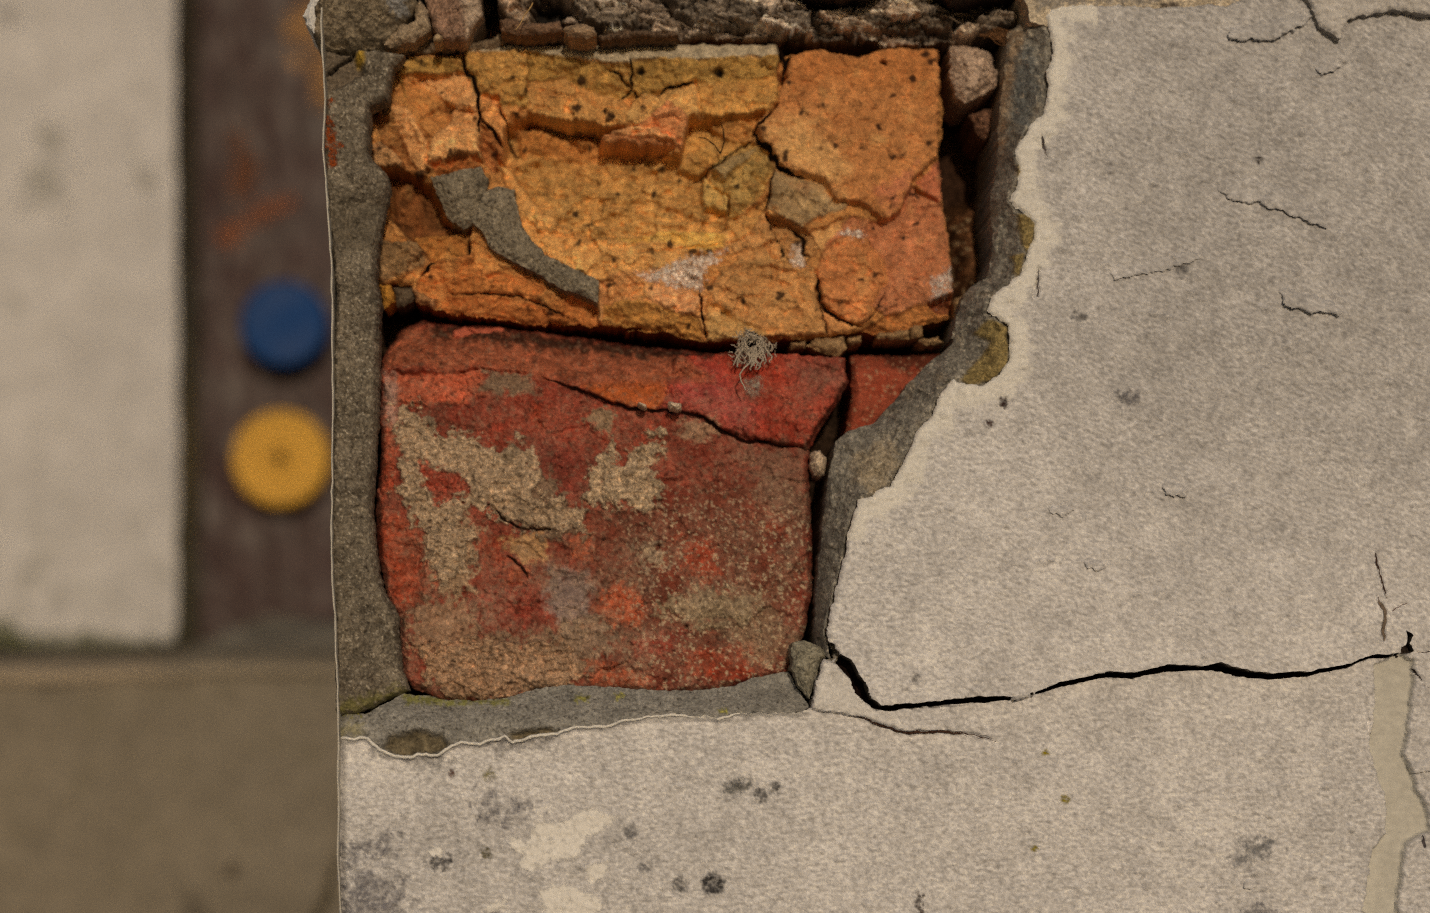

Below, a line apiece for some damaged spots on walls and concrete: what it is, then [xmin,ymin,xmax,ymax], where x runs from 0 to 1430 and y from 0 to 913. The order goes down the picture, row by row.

peeling [303,0,319,49]
peeling [1303,0,1430,42]
crack [462,54,520,159]
crack [605,57,694,101]
crack [690,47,886,338]
crack [421,240,571,320]
spalling [341,0,1239,759]
crack [836,553,1430,742]